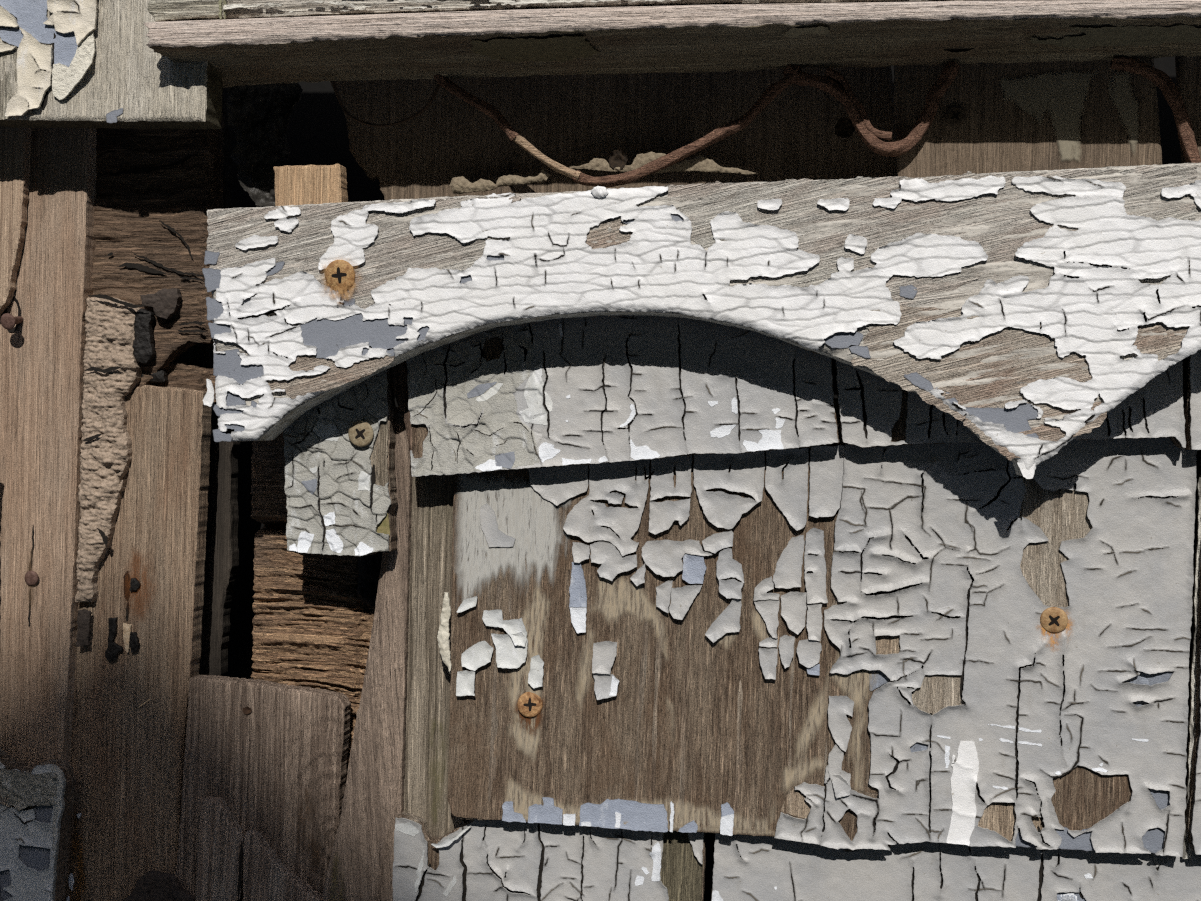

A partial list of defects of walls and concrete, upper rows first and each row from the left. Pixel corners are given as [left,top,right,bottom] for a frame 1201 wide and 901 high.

peeling [52,32,95,100]
peeling [203,379,258,442]
peeling [266,346,395,399]
crack [286,384,377,548]
peeling [202,196,521,338]
peeling [585,216,635,249]
peeling [665,165,1198,461]
crack [398,213,1201,901]
peeling [1020,477,1092,607]
peeling [427,445,879,901]
peeling [875,635,900,655]
peeling [1051,765,1132,831]